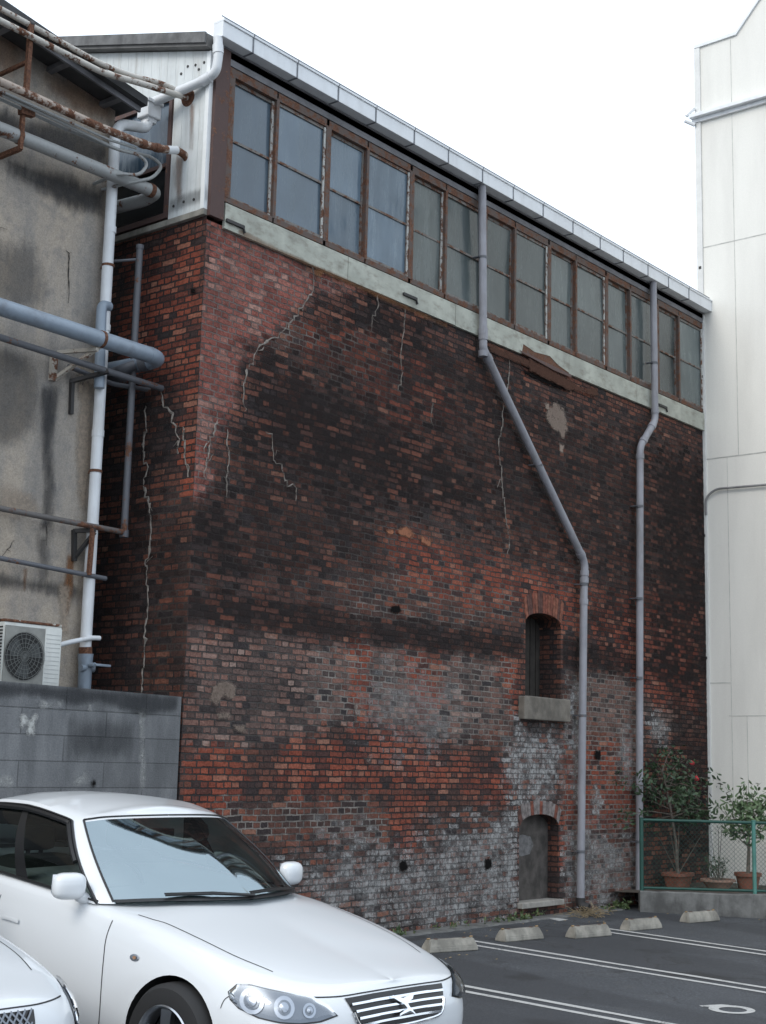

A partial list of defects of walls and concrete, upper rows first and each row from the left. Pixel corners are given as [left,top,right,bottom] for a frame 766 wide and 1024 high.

crack [242,266,314,411]
crack [398,309,406,390]
crack [265,431,297,501]
crack [497,360,510,554]
spalling [545,403,567,453]
crack [141,392,230,693]
damp [21,714,37,734]
damp [300,682,579,928]
damp [560,830,636,908]